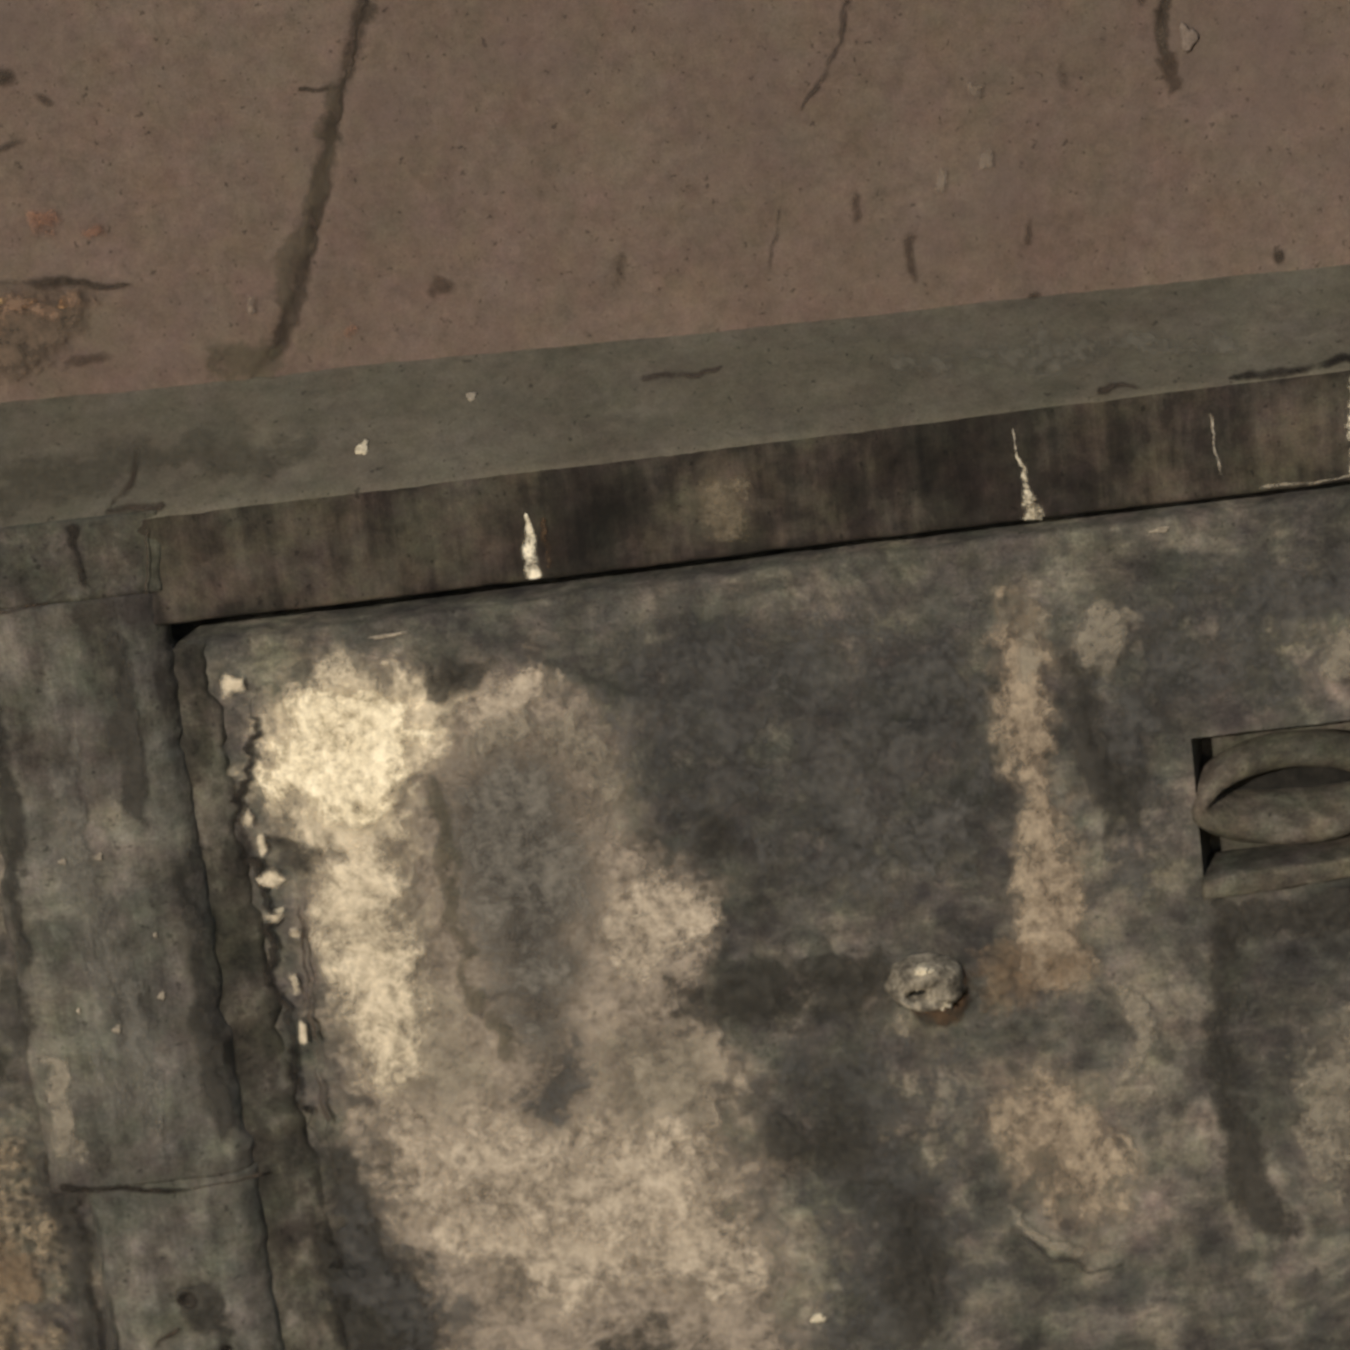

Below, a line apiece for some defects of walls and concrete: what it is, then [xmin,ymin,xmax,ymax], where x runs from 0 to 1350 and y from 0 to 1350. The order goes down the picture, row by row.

crack [802,0,847,107]
crack [1140,0,1199,91]
crack [269,0,377,359]
efflorescence [1012,429,1041,520]
efflorescence [1262,474,1350,488]
efflorescence [523,513,540,579]
leakage [0,727,31,970]
leakage [305,561,1350,1350]